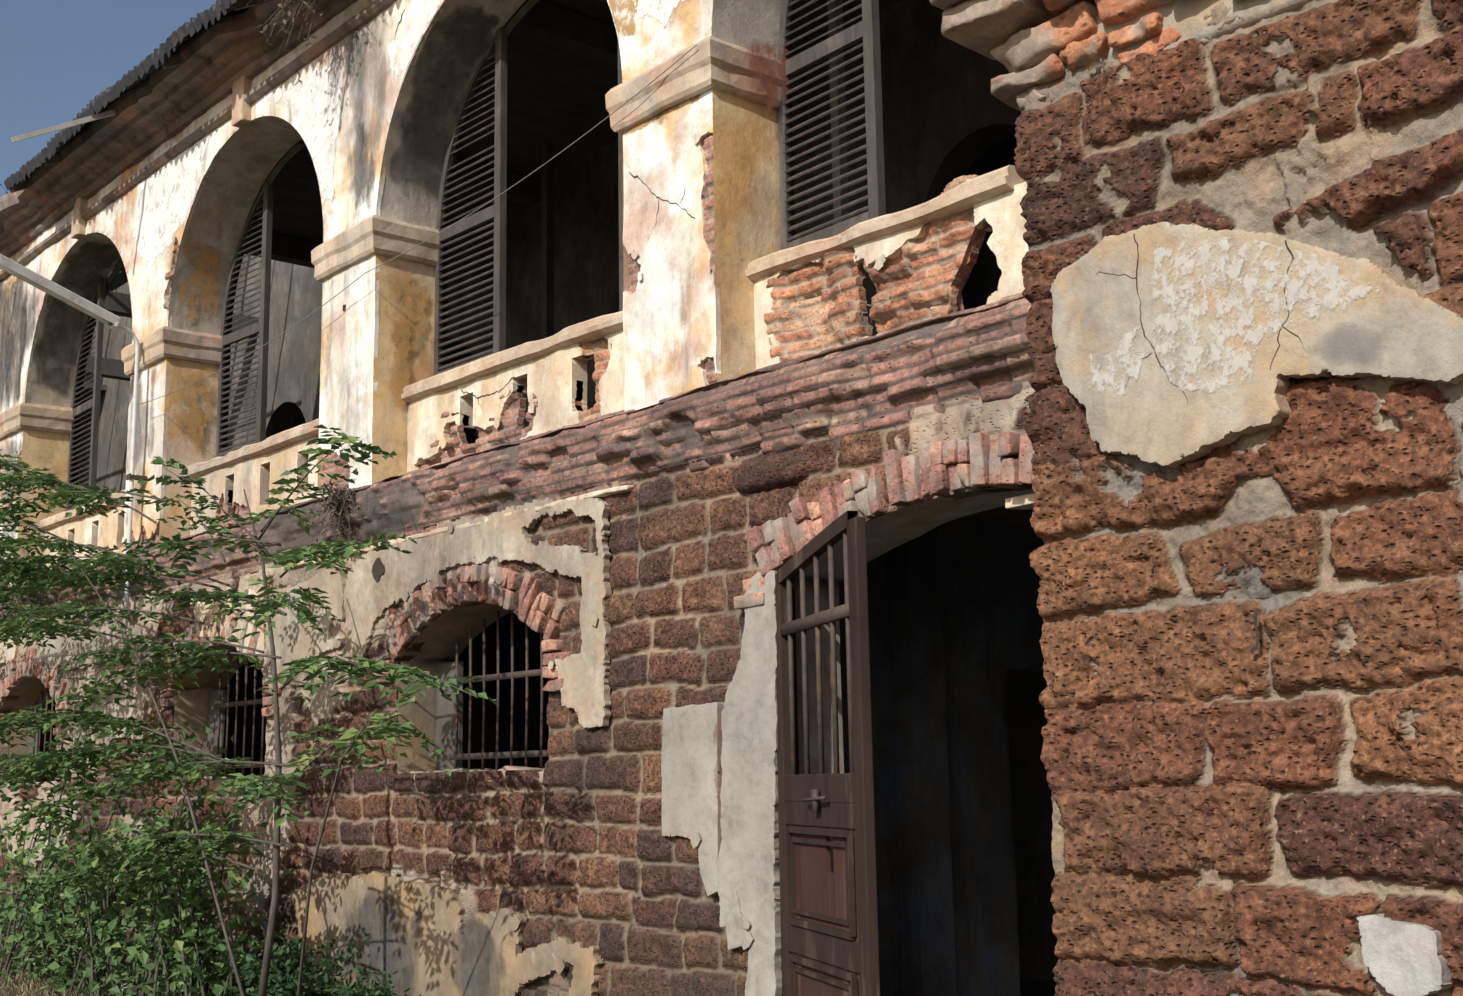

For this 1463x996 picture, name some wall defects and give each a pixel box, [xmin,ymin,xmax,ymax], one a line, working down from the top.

peeling [609,0,687,36]
leakage [333,8,499,205]
crack [629,172,695,239]
spalling [940,175,978,195]
spalling [764,207,996,362]
crack [1101,234,1188,403]
peeling [1090,237,1379,395]
crack [1270,240,1306,369]
spalling [419,388,538,468]
spalling [574,337,610,421]
leakage [342,894,420,996]
leakage [459,917,501,996]